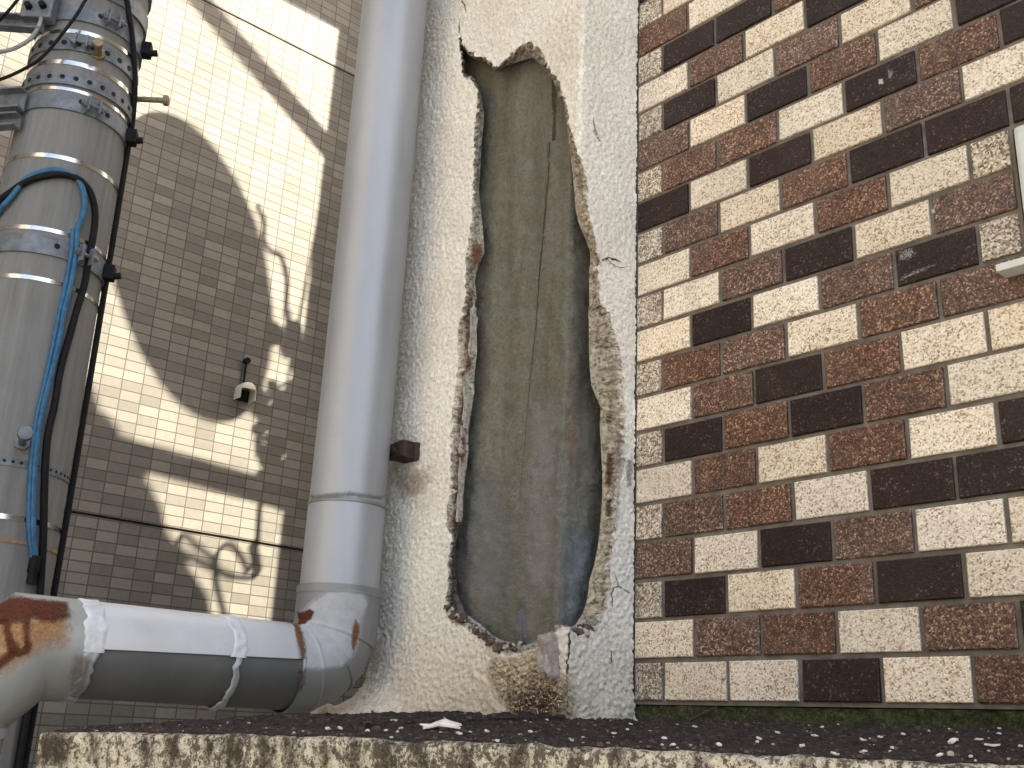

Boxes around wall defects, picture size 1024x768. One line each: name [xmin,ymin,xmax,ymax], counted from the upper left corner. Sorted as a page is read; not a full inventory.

corrosion [472,243,484,267]
crack [519,80,556,509]
flaking render [443,37,632,716]
crack [564,632,572,713]